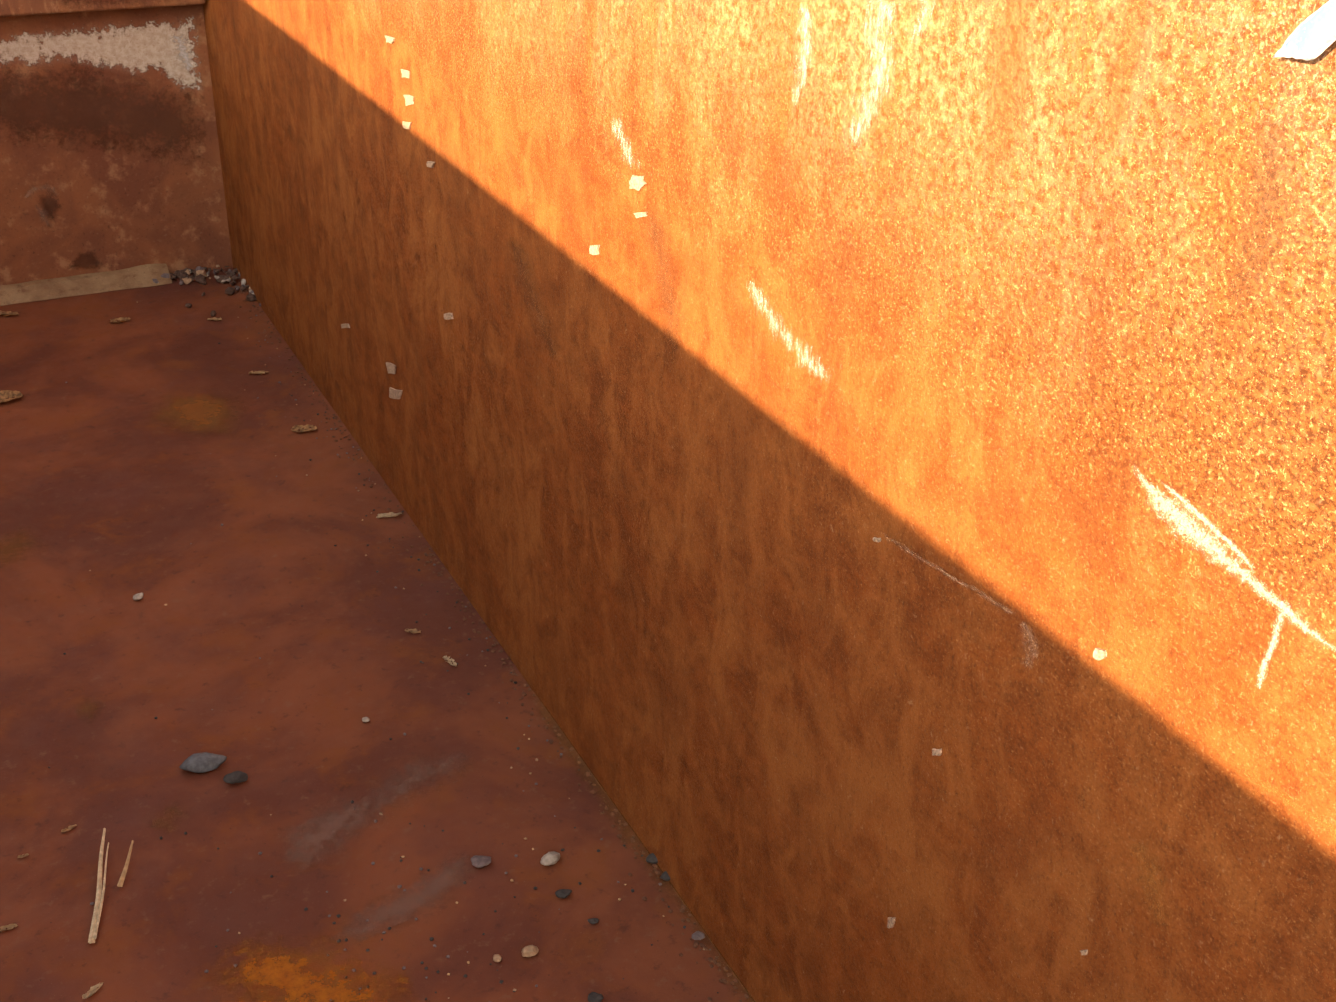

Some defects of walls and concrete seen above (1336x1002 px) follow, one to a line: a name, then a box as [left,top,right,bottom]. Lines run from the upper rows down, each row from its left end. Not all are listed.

peeling [0,17,202,90]
rust [229,948,405,1002]